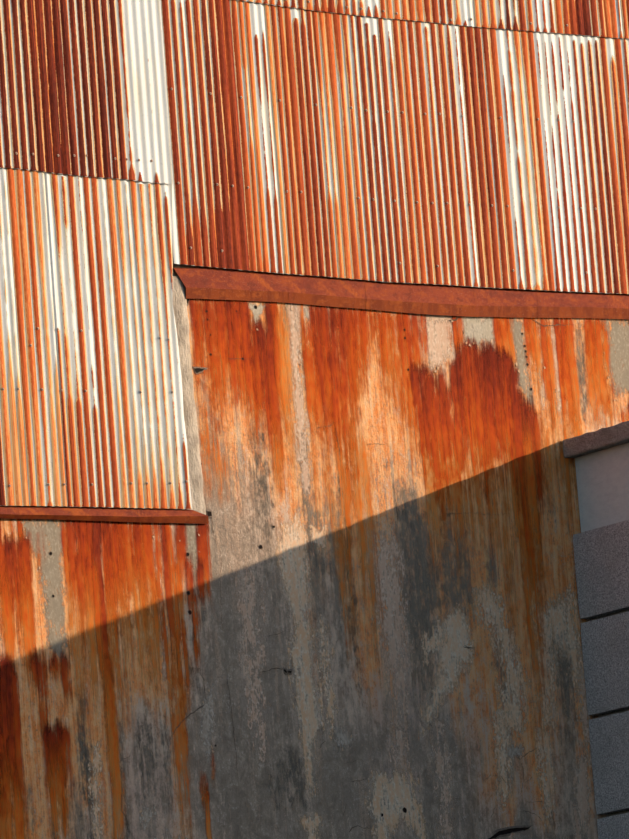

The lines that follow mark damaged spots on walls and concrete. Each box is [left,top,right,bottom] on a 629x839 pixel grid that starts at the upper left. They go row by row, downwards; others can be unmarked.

rust [0,0,629,509]
rust [0,519,212,839]
rust [301,304,629,689]